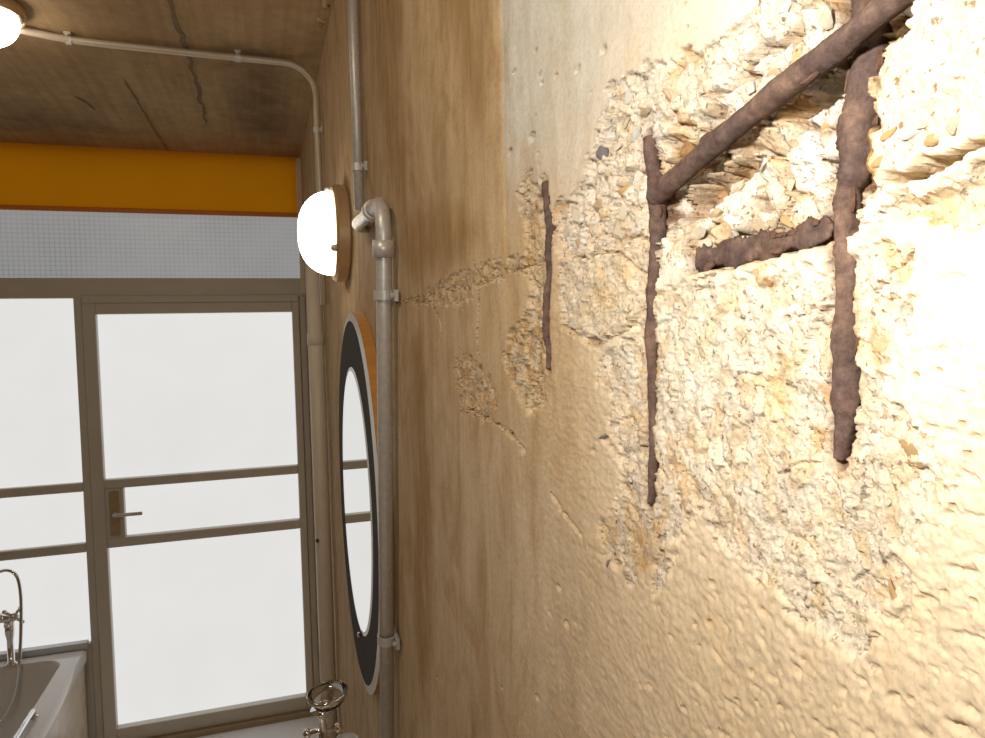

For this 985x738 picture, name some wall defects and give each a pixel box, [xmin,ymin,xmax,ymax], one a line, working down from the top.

crack [124,80,168,150]
crack [167,0,208,125]
spalling [453,352,498,424]
spalling [502,0,985,669]